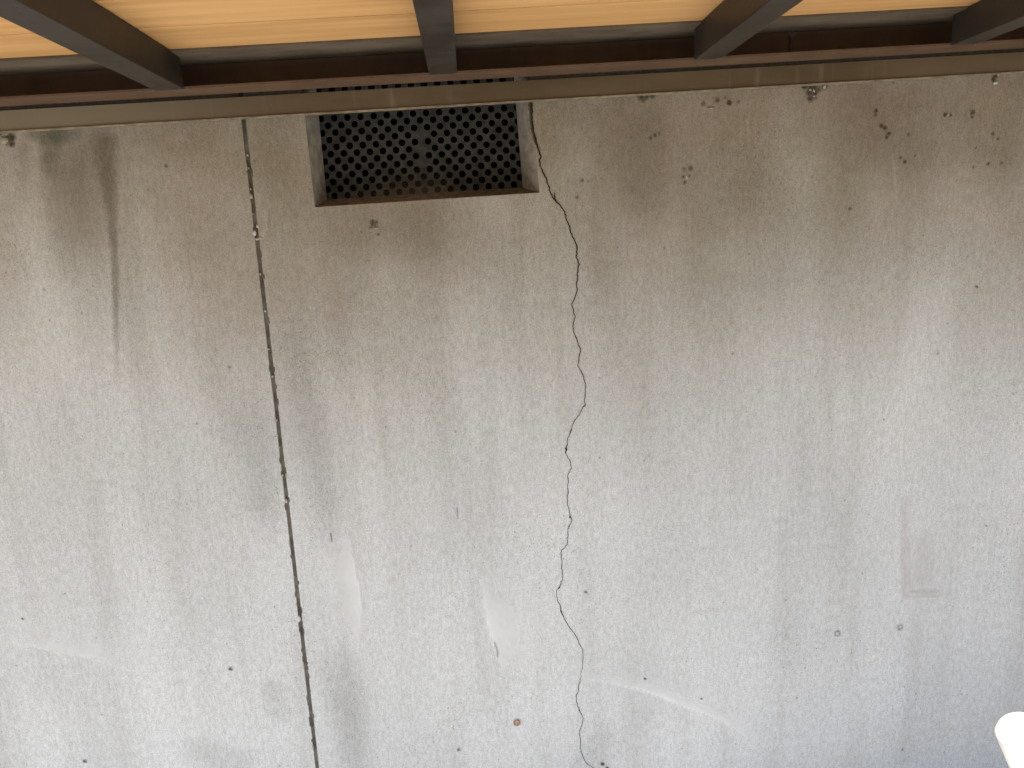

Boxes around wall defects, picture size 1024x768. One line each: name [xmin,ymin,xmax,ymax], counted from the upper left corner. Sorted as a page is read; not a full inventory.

crack [528,102,593,768]